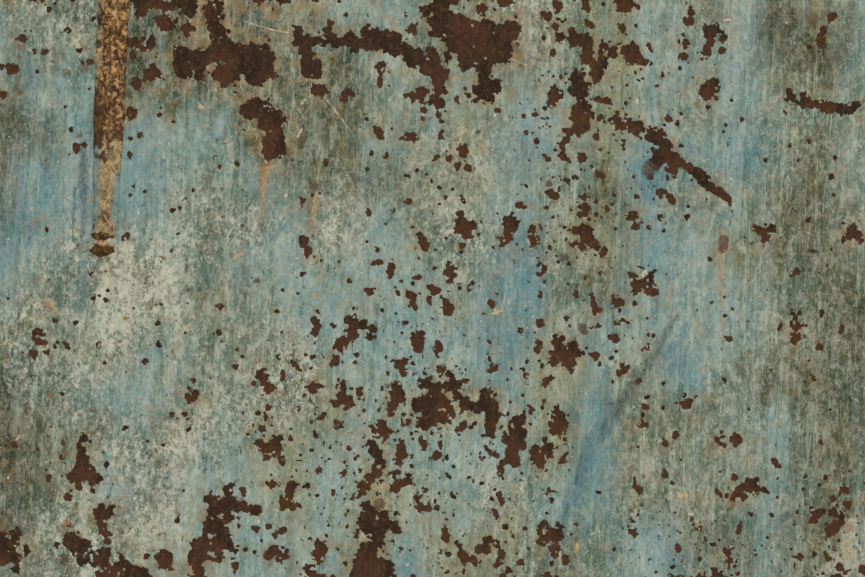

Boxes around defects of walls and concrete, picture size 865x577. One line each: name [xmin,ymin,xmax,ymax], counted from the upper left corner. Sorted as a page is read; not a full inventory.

corrosion [64,48,95,76]
corrosion [125,105,143,121]
corrosion [68,127,88,156]
corrosion [291,0,733,320]
corrosion [168,378,200,432]
corrosion [661,393,698,410]
corrosion [656,430,685,448]